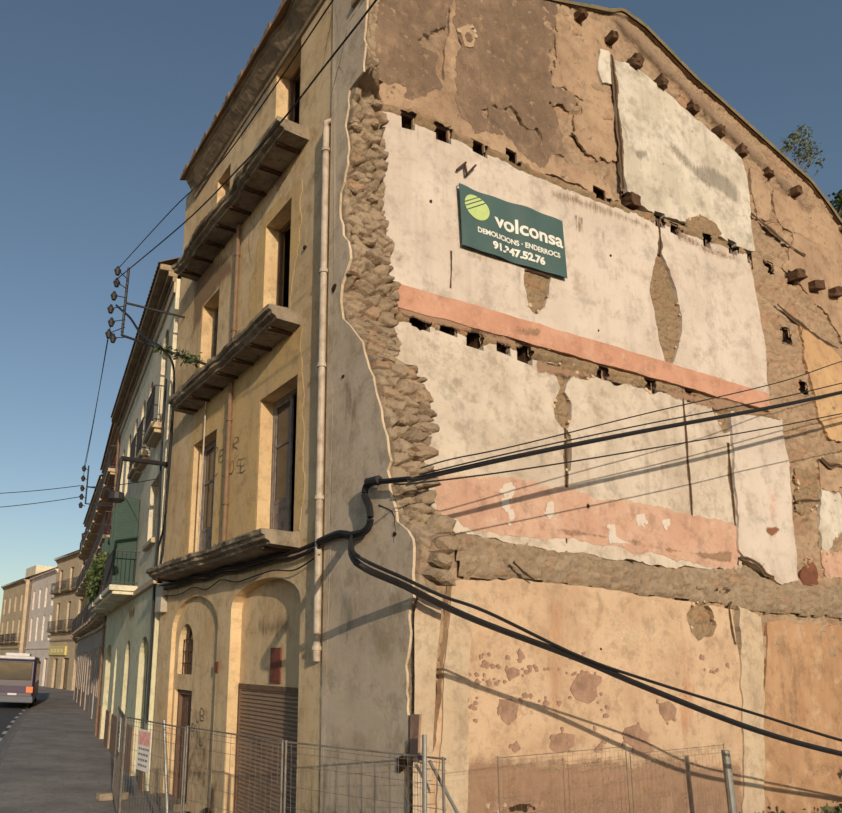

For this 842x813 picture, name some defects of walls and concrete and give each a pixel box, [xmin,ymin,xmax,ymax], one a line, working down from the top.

peeling [456,24,478,48]
crack [611,54,628,189]
spalling [650,256,681,363]
peeling [499,482,516,526]
spalling [793,468,820,520]
peeling [606,524,630,546]
spalling [686,600,716,639]
peeling [469,648,609,725]
peeling [656,699,677,725]
peeling [549,727,575,753]
peeling [622,722,655,758]
leakage [467,759,742,813]